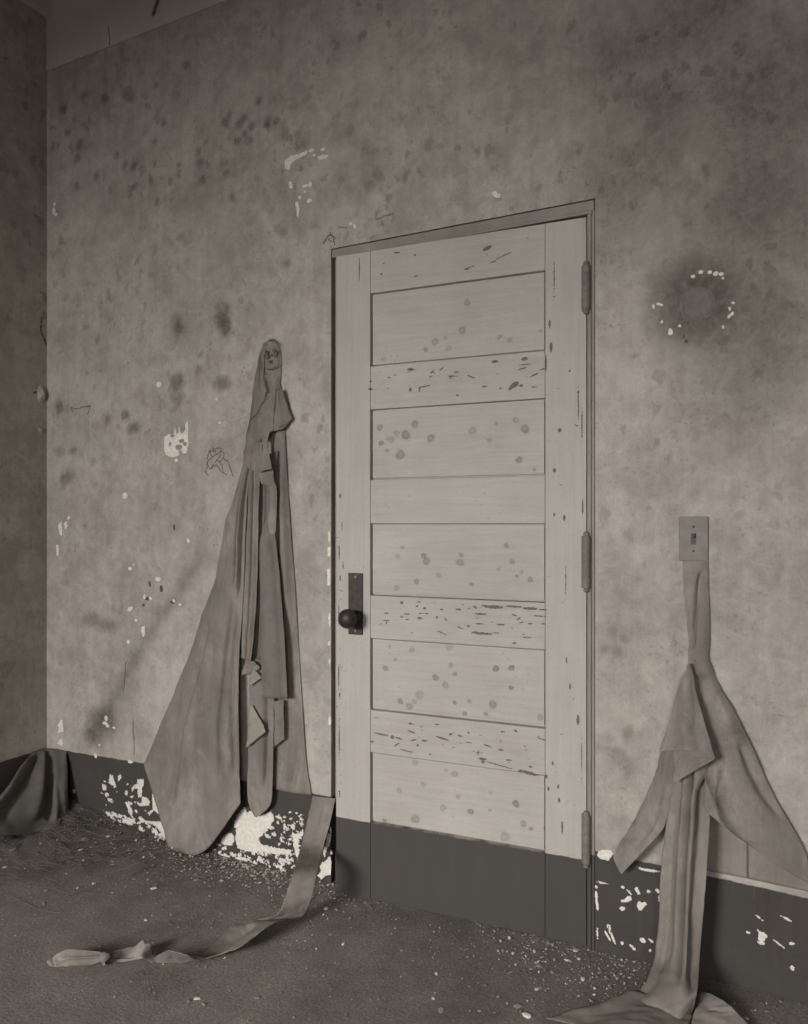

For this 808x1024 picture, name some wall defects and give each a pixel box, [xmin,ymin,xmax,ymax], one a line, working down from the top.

peeling [284,148,329,218]
peeling [164,420,189,462]
peeling [101,774,165,840]
peeling [213,807,304,872]
peeling [318,826,333,880]
peeling [597,850,613,861]
peeling [619,886,660,911]
peeling [596,924,654,952]
peeling [746,915,795,948]